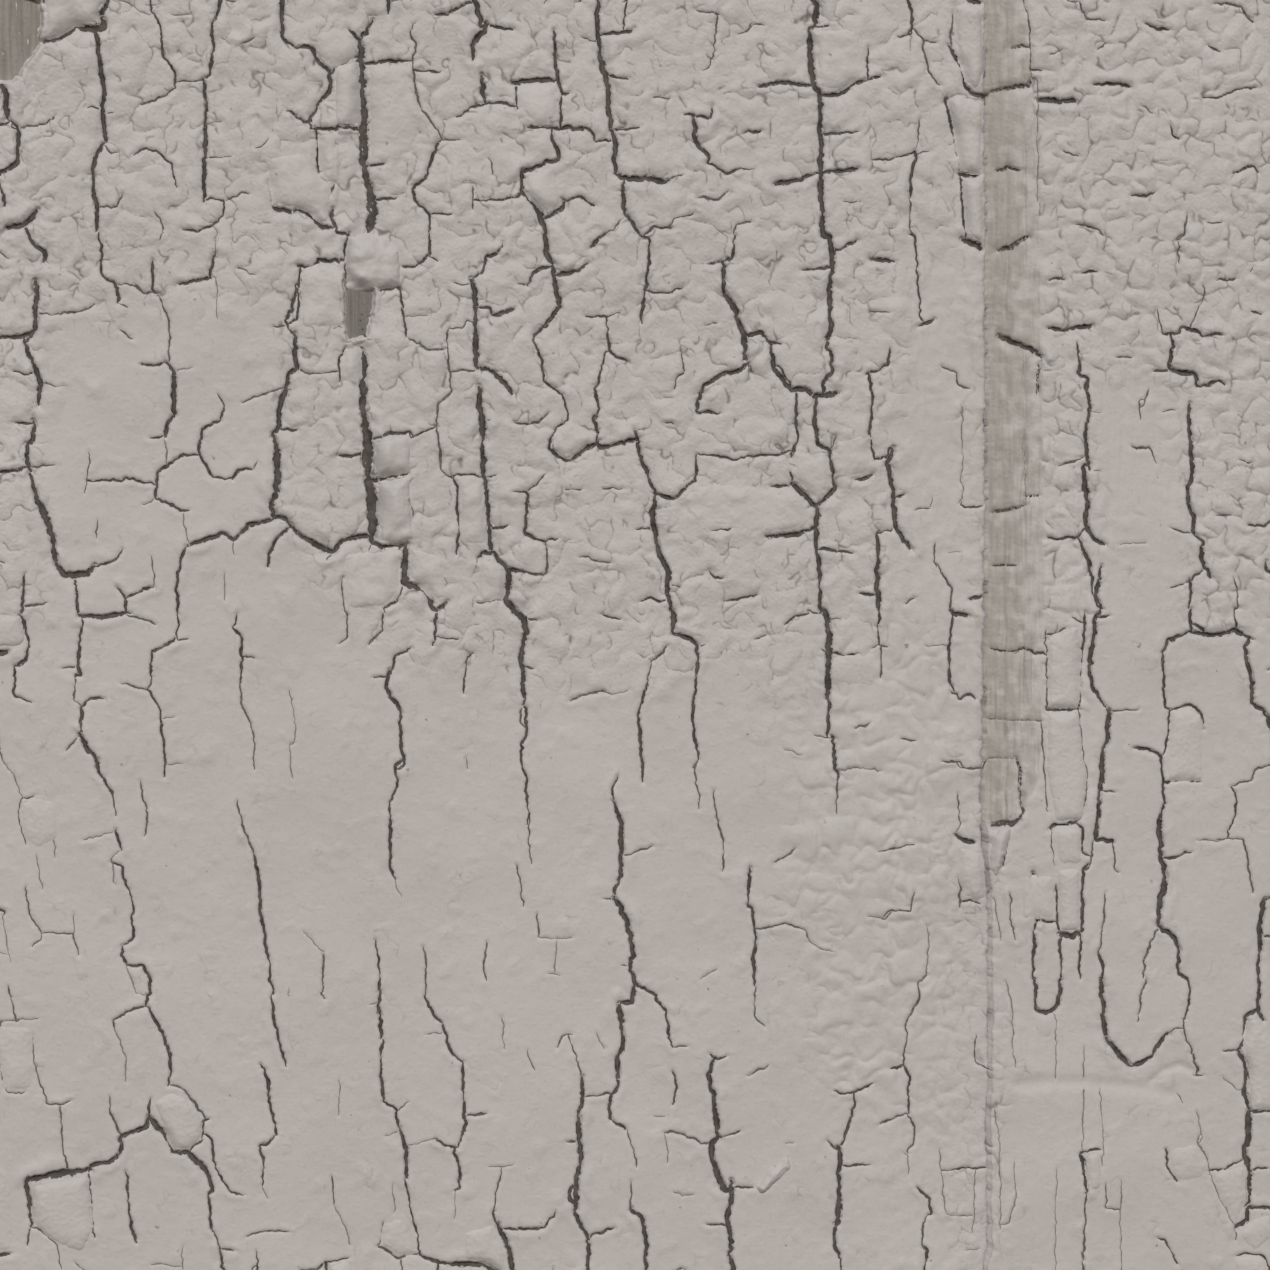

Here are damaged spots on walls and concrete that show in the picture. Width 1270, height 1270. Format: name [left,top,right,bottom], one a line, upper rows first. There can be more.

peeling [0,0,102,81]
crack [897,0,1180,252]
crack [1202,87,1256,99]
crack [1214,2,1254,23]
crack [1233,165,1259,174]
crack [1176,214,1222,263]
peeling [300,263,373,382]
peeling [983,0,1087,933]
peeling [0,616,26,646]
crack [0,0,935,1270]
crack [925,267,1270,1270]
crack [827,892,1017,1270]